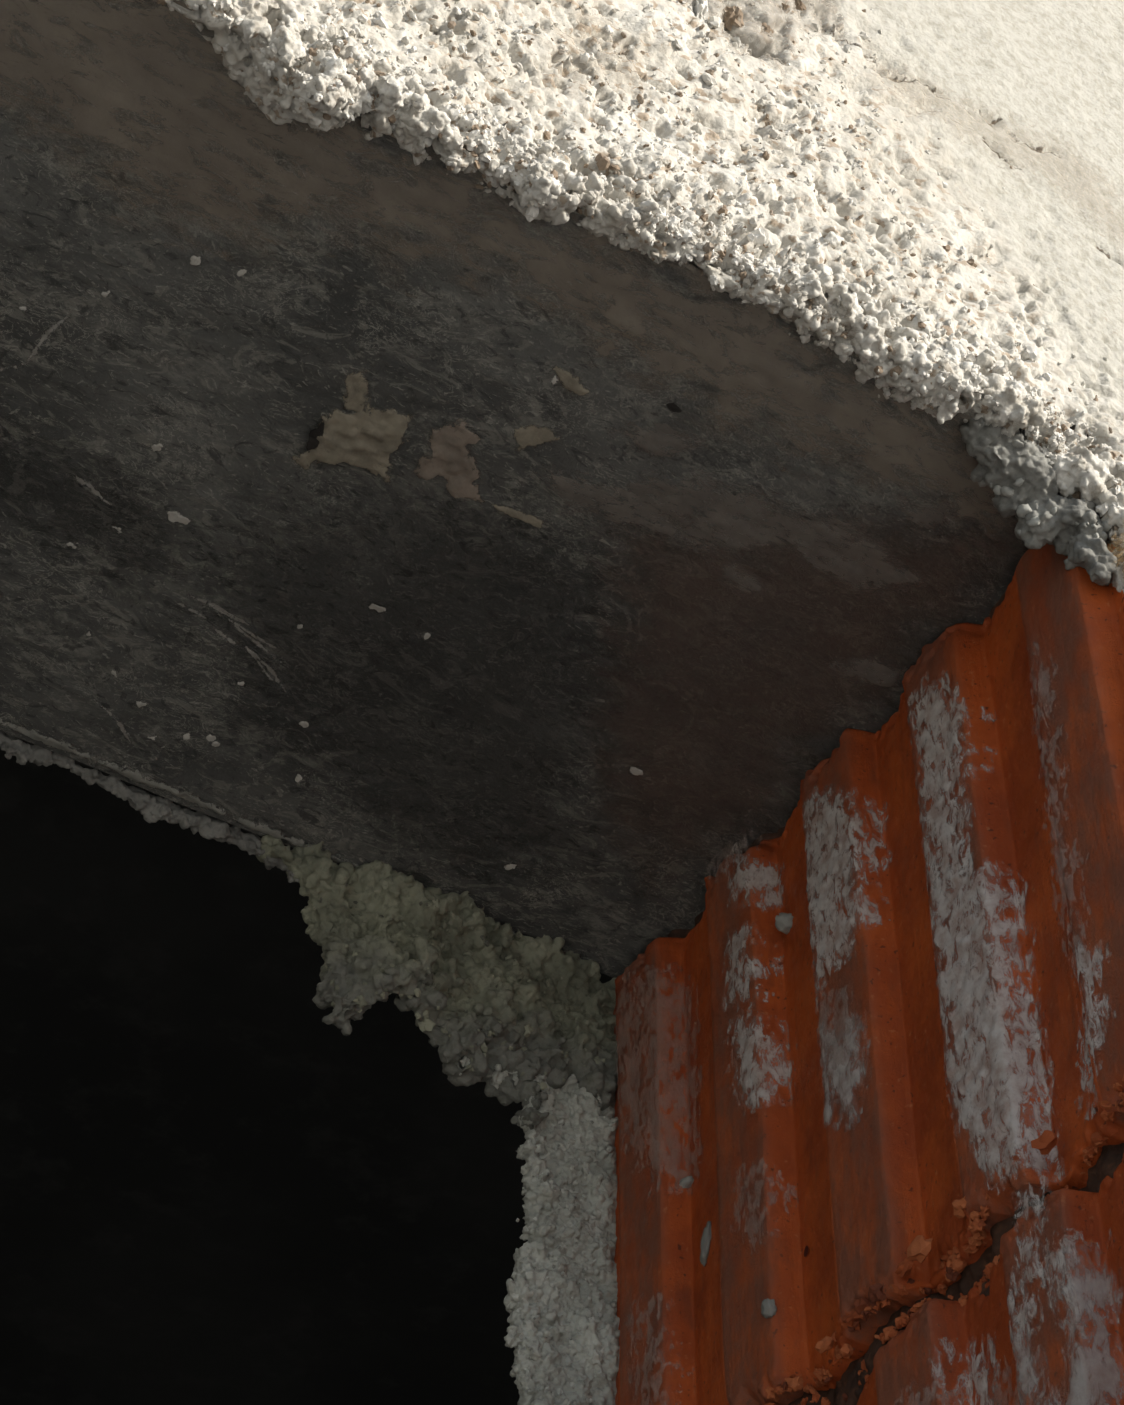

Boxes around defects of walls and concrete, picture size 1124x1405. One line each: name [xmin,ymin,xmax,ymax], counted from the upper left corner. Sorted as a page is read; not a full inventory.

peeling [292,372,411,482]
peeling [413,419,544,528]
peeling [514,425,560,451]
peeling [551,366,589,396]
damp [724,843,785,911]
damp [803,788,892,1005]
damp [724,924,792,1113]
damp [819,1014,870,1131]
damp [828,659,1122,1405]
crack [765,1076,1124,1405]